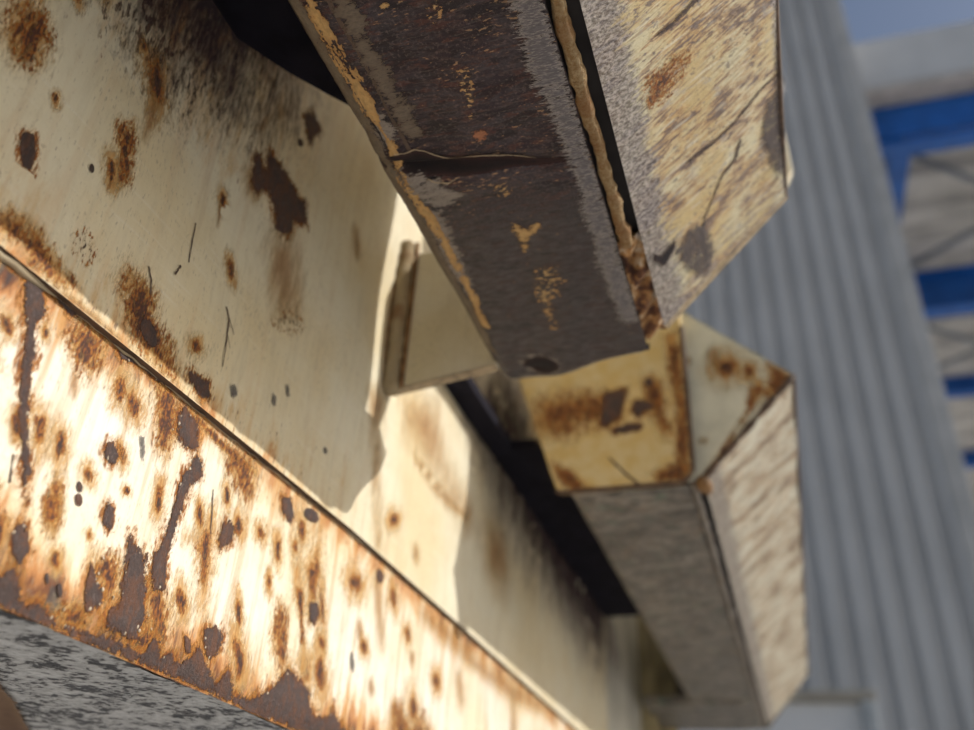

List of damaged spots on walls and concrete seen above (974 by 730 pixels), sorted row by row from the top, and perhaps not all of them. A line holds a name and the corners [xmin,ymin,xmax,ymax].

corrosion [0,0,57,72]
corrosion [14,128,39,178]
corrosion [101,34,170,197]
peeling [249,145,310,241]
peeling [288,0,500,354]
crack [366,114,583,184]
peeling [505,0,639,324]
corrosion [0,204,77,578]
corrosion [642,331,691,482]
corrosion [63,264,332,711]
corrosion [341,562,414,664]
corrosion [390,682,432,730]